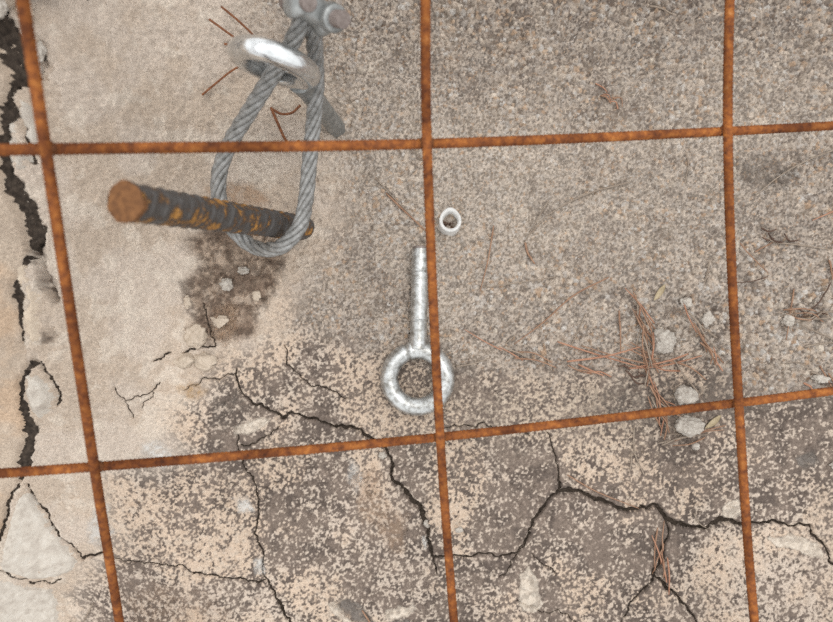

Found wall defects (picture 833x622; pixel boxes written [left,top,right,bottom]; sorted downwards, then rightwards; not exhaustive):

spalling [0,0,9,19]
flaking render [9,100,38,144]
crack [0,11,47,341]
flaking render [10,155,39,170]
crack [154,303,216,361]
rust [0,0,458,622]
rust [432,0,833,622]
flaking render [25,375,60,418]
crack [284,345,344,398]
crack [0,360,833,622]
flaking render [0,489,78,622]